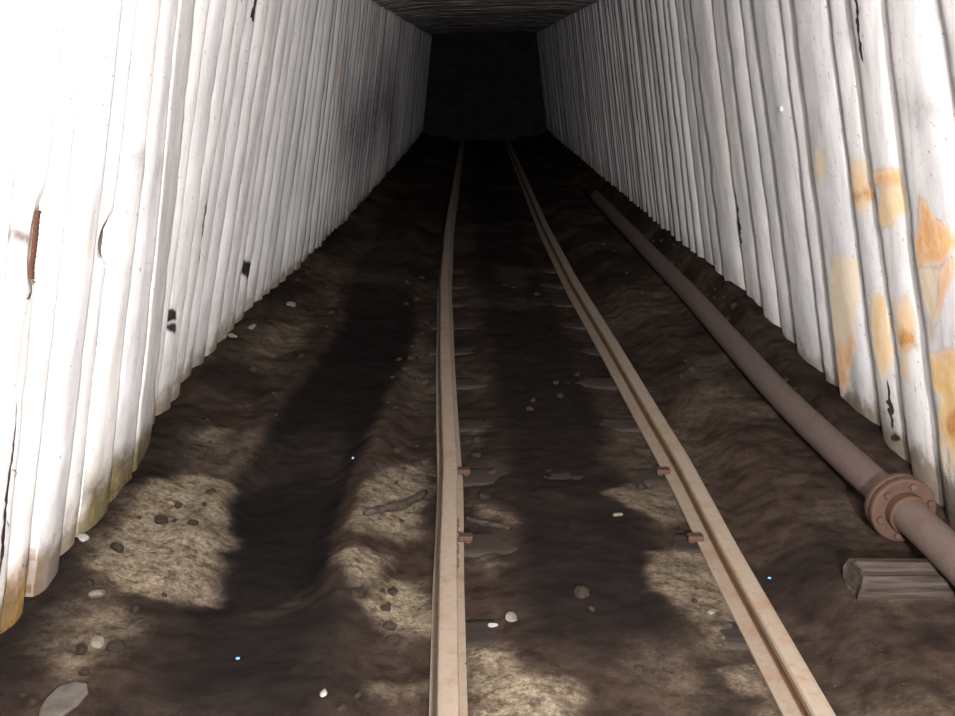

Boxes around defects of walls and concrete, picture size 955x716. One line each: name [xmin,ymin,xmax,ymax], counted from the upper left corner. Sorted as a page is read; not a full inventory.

crack [854,0,864,63]
rust [829,154,955,481]
crack [0,407,17,574]
crack [886,381,900,441]